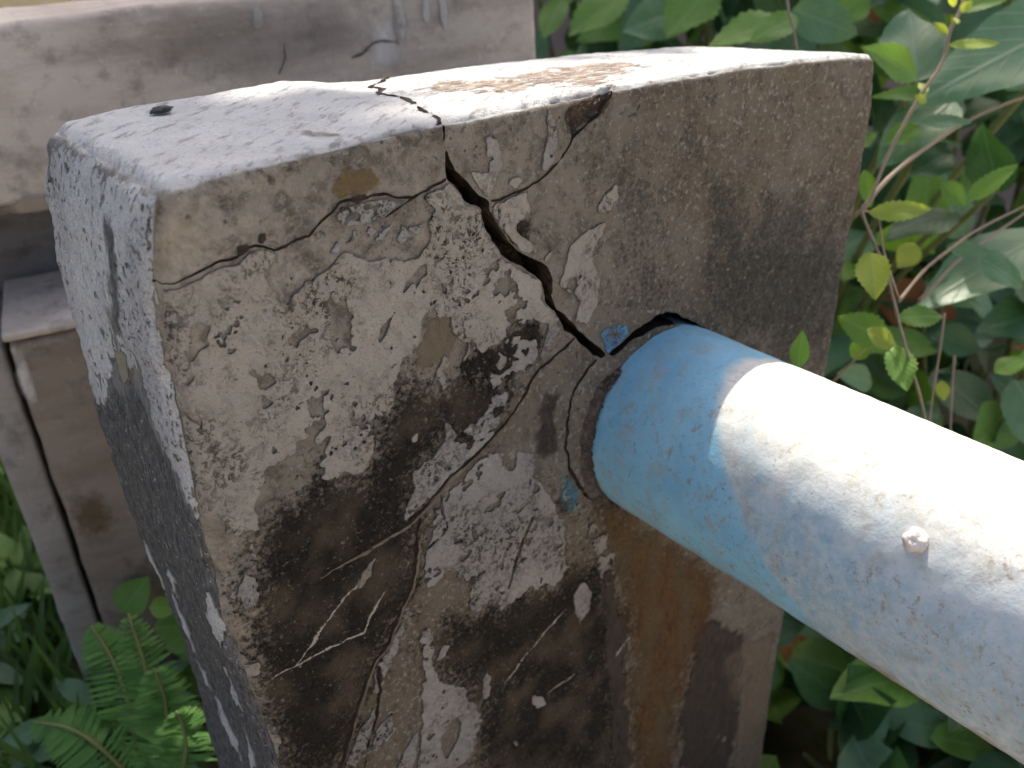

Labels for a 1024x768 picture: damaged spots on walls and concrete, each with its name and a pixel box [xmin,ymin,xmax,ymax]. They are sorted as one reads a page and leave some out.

flaking render [44,137,619,623]
damp [94,316,634,768]
crack [116,77,706,768]